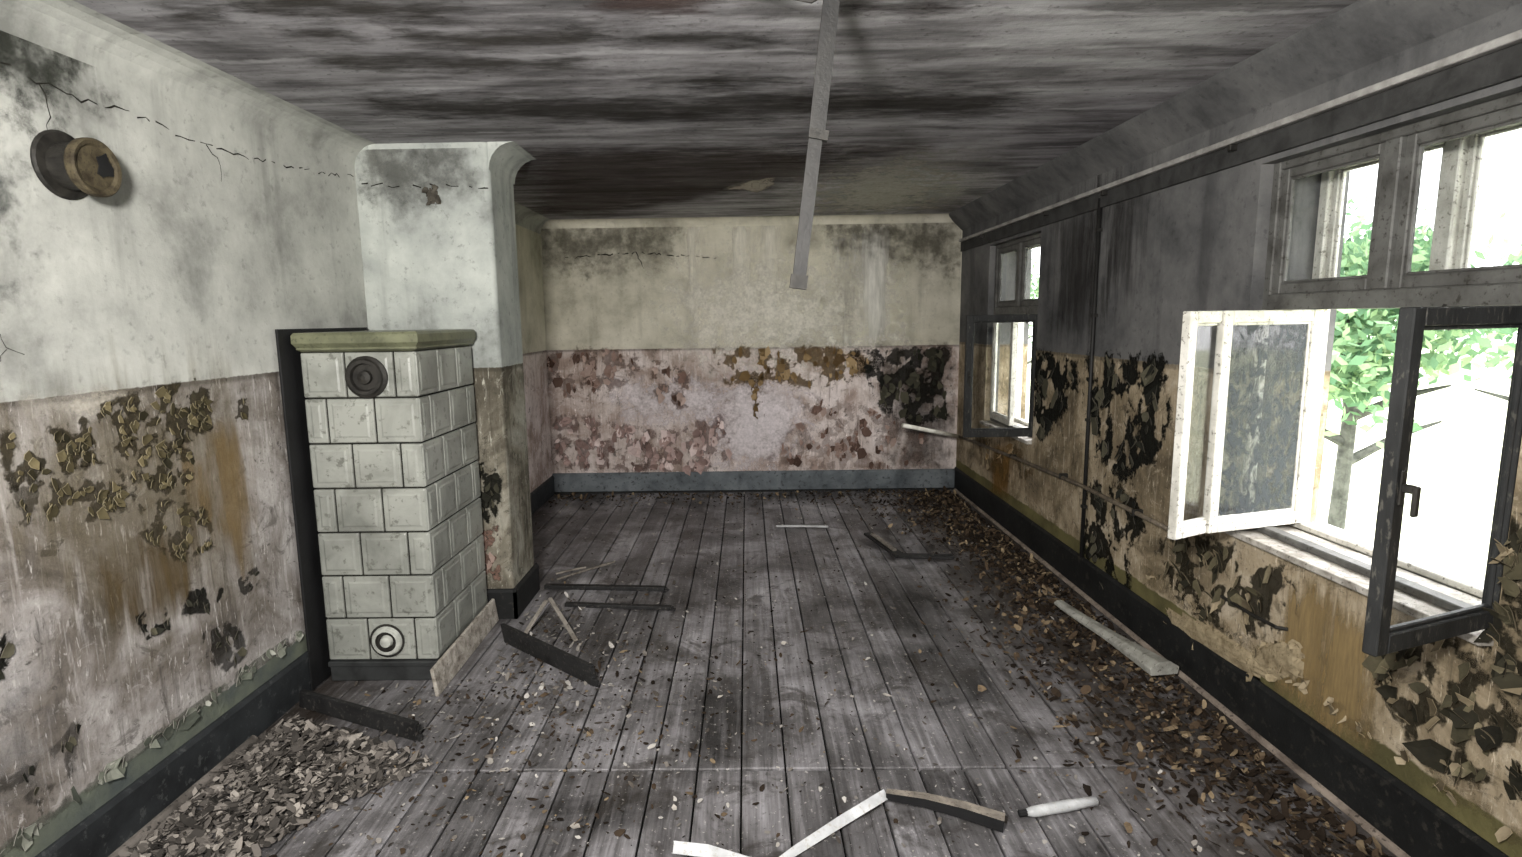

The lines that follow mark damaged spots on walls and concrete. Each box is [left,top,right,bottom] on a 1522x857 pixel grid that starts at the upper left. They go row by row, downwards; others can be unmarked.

mould [0,30,73,93]
water stain [238,0,588,72]
water stain [637,34,767,42]
water stain [840,1,954,13]
water stain [367,76,1021,123]
water stain [524,144,922,213]
peeling [712,345,952,470]
peeling [0,378,214,562]
peeling [1031,349,1310,695]
peeling [0,634,15,679]
peeling [136,568,304,748]
peeling [1362,513,1522,806]